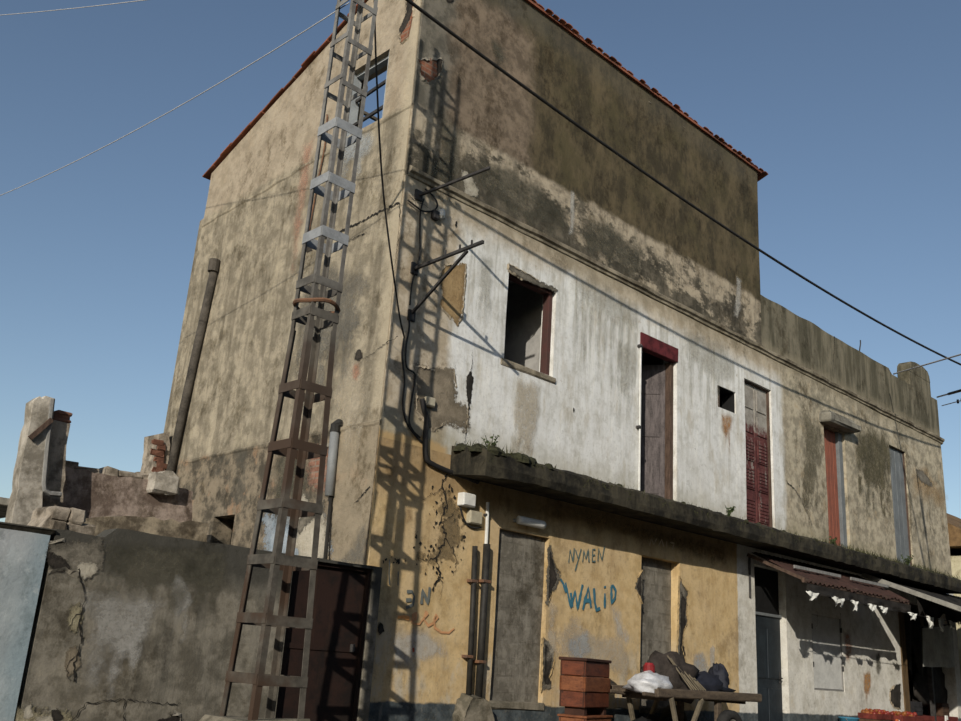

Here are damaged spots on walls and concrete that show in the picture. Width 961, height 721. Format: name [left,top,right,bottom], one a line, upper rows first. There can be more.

spalling [398,0,417,45]
spalling [416,57,444,85]
water stain [430,117,456,178]
water stain [480,161,642,270]
peeling [436,263,467,326]
peeling [412,361,471,434]
peeling [262,443,334,558]
crack [417,474,460,594]
spalling [545,544,561,607]
crack [65,568,86,682]
crack [72,698,179,721]
spalling [889,684,901,710]